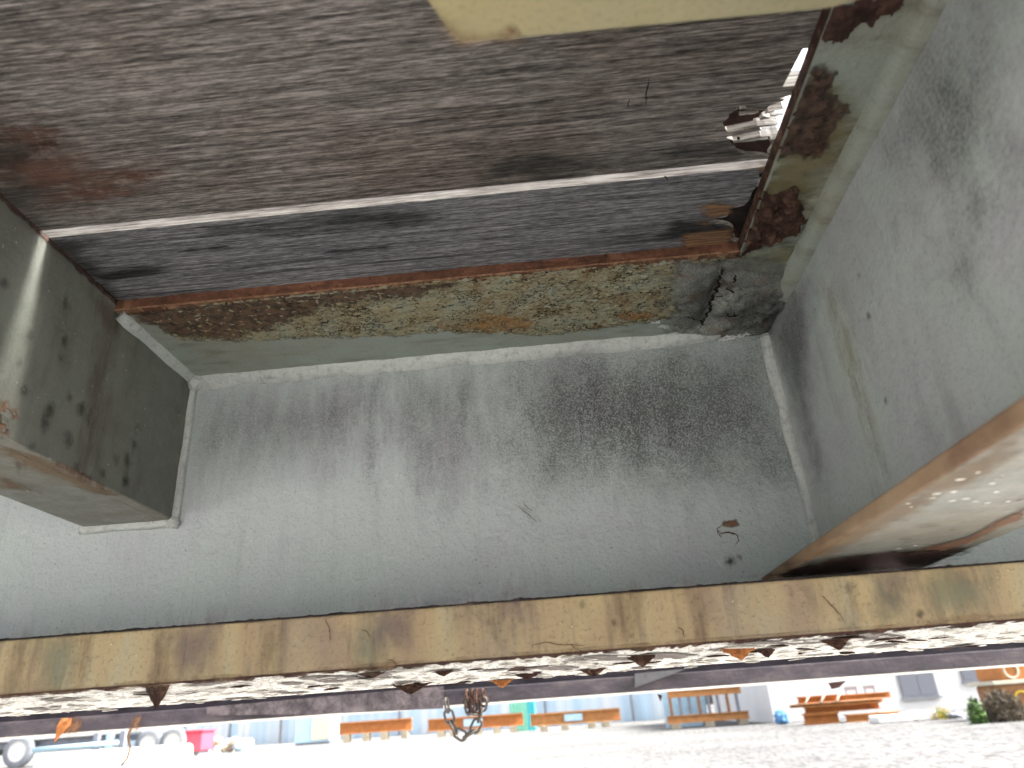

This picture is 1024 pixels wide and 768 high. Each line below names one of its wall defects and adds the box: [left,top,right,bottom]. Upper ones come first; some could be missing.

rust [821,0,904,44]
rust [0,67,852,340]
rust [0,443,1024,641]
rust [0,613,1024,698]
peeling [0,624,1024,717]